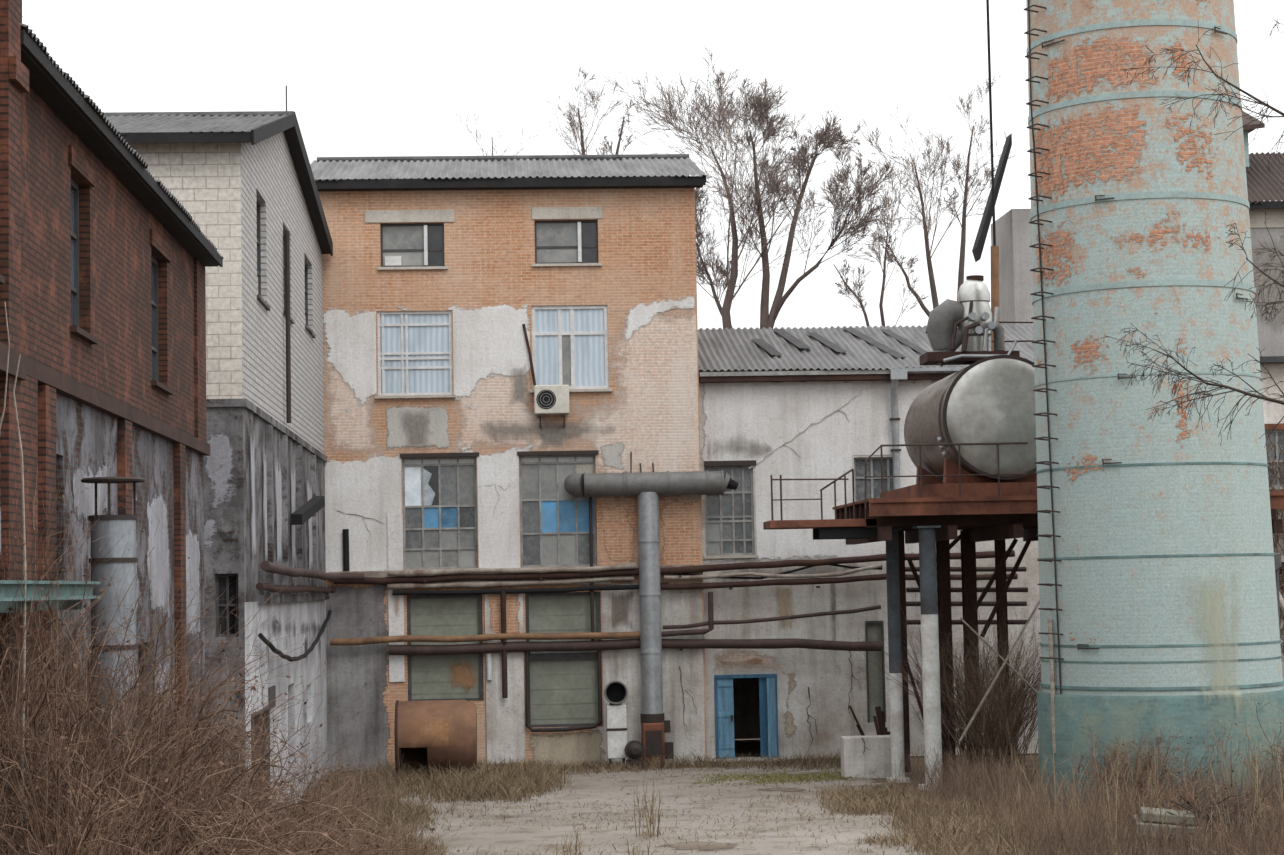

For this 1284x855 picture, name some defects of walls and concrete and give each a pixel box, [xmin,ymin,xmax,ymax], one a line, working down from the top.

peeling [1032,34,1220,291]
flaking render [73,457,112,524]
flaking render [136,432,237,641]
damp [251,441,318,580]
damp [487,424,589,444]
flaking render [448,295,939,568]
crack [749,380,876,469]
peeling [1069,335,1109,376]
peeling [1168,380,1195,449]
spalling [488,594,520,633]
flaking render [528,582,642,767]
flaking render [661,583,705,764]